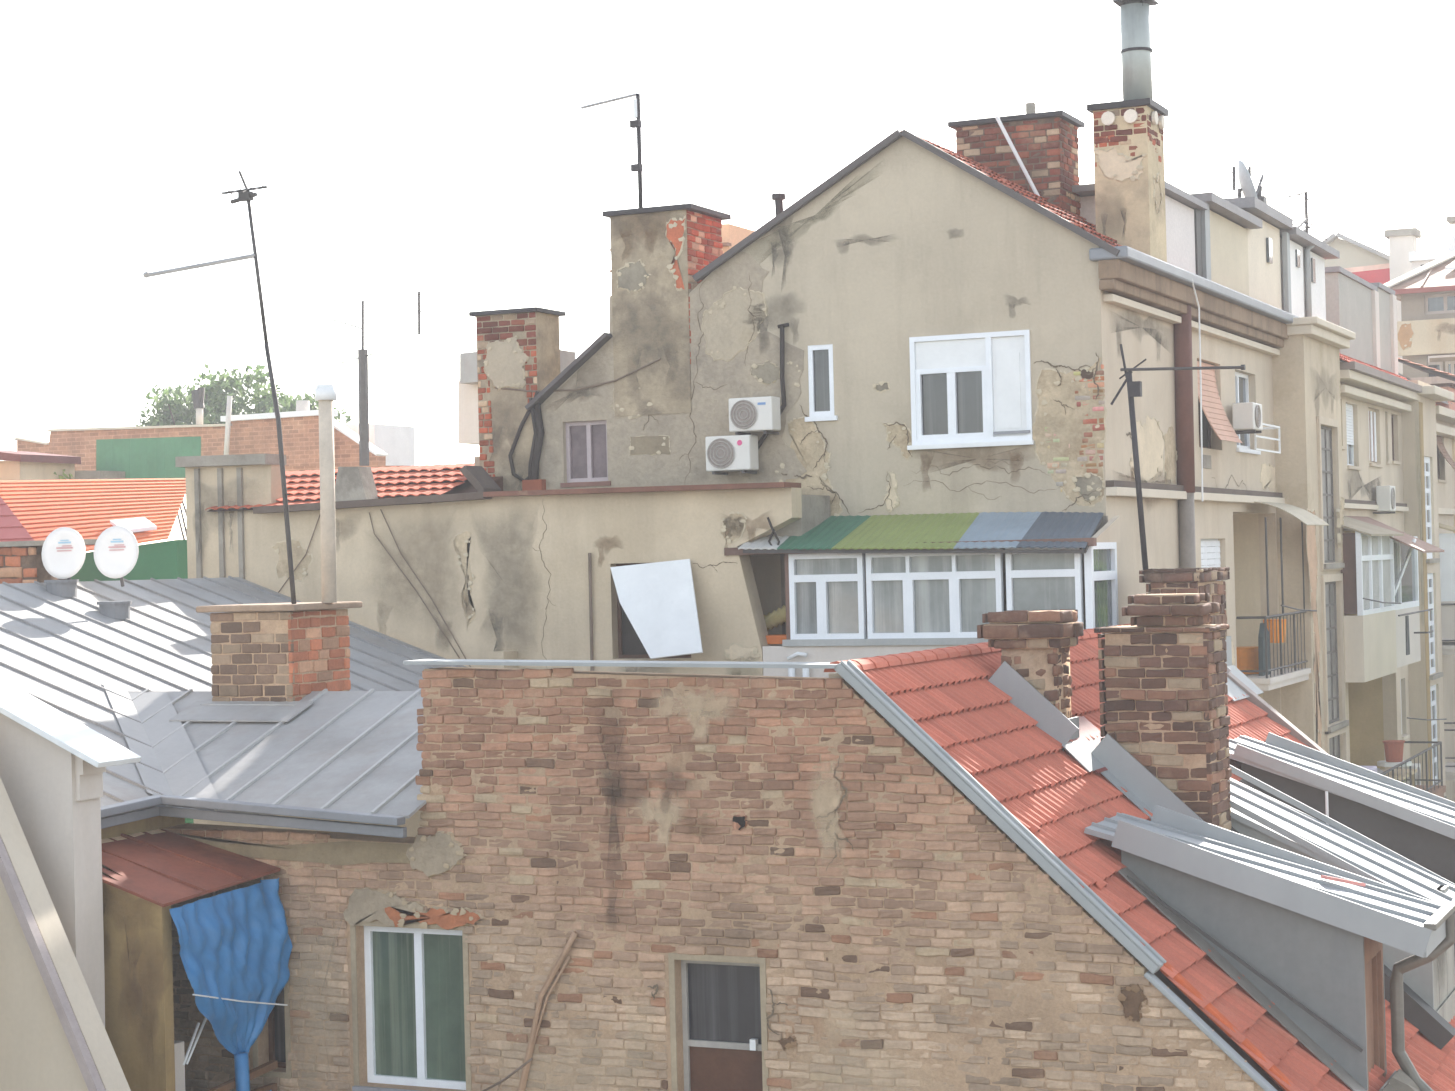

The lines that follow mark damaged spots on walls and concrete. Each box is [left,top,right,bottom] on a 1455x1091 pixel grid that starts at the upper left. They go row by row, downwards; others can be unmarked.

flaking render [1093,147,1163,214]
flaking render [483,336,529,391]
flaking render [775,416,843,516]
crack [781,405,1100,513]
flaking render [1032,356,1108,507]
flaking render [1129,413,1177,485]
crack [533,506,555,667]
flaking render [406,830,468,878]
flaking render [384,906,485,930]